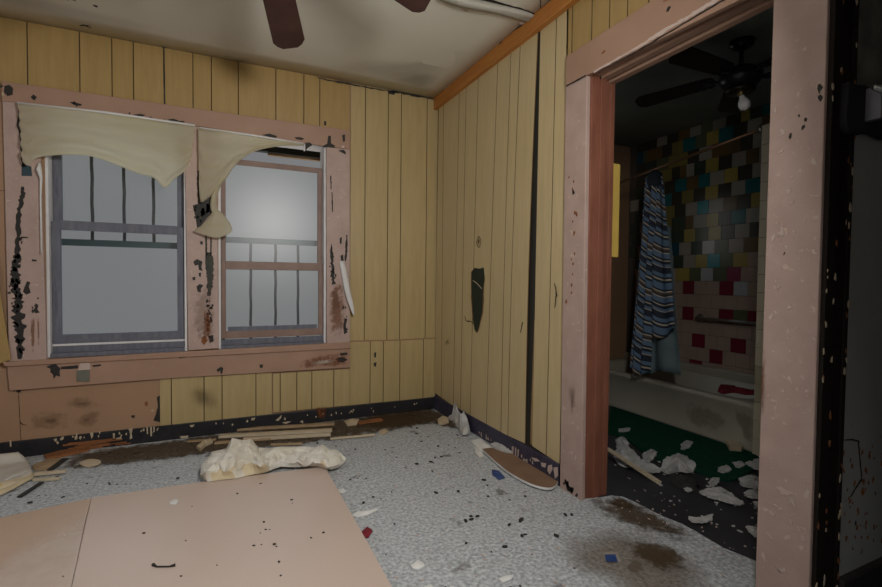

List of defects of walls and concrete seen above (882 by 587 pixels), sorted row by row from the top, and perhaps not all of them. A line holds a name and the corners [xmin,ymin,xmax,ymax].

peeling [8,109,40,359]
peeling [193,171,212,228]
peeling [192,236,219,347]
hole [465,267,485,332]